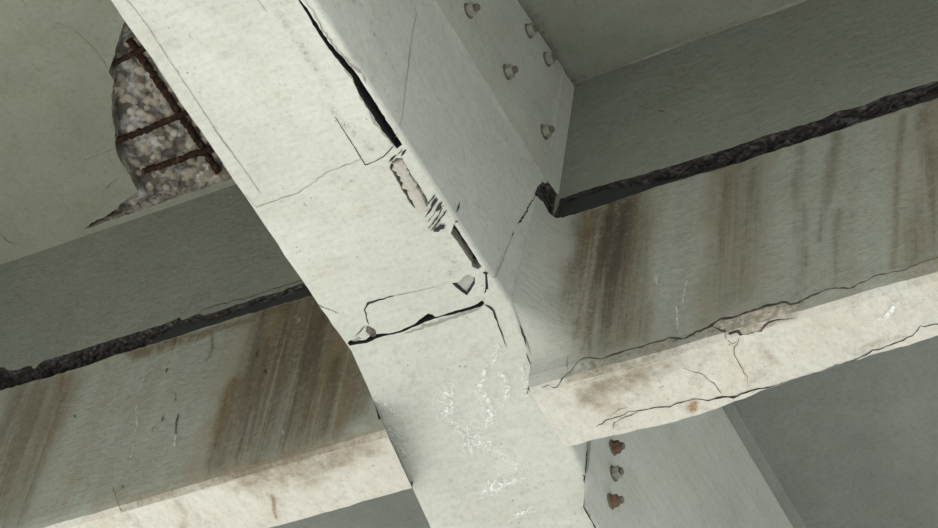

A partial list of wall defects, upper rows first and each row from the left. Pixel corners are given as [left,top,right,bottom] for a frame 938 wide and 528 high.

spalling [85,22,232,229]
spalling [535,81,938,218]
spalling [0,283,312,391]
crack [347,196,938,428]
water stain [434,386,517,494]